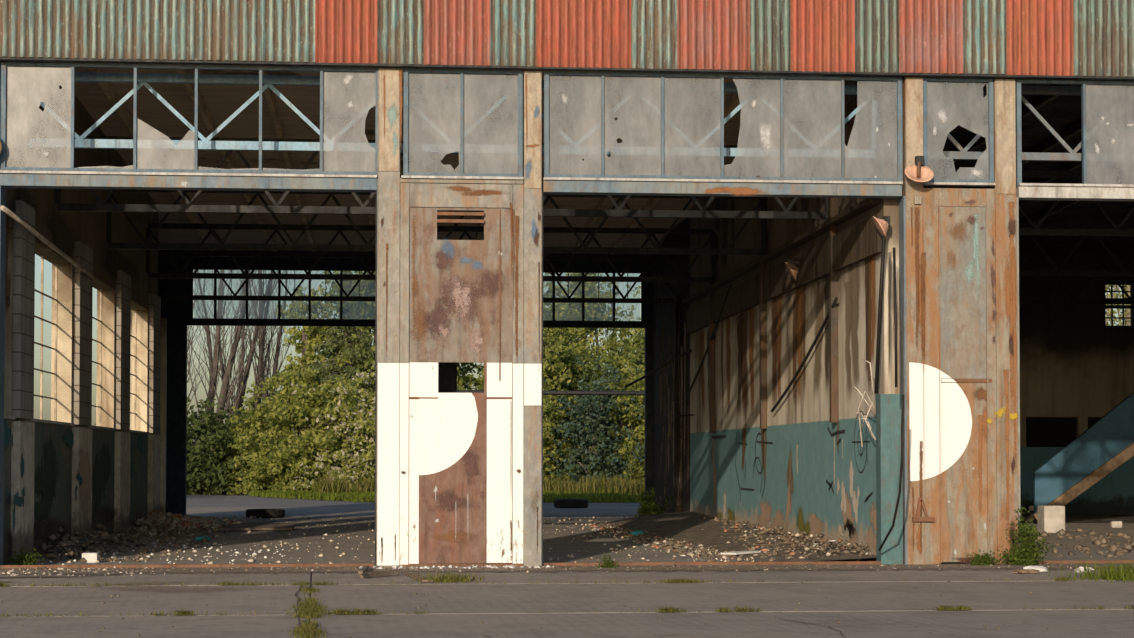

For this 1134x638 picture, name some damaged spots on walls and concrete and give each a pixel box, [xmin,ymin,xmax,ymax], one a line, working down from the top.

rust [950,200,983,239]
peeling [453,280,470,317]
damp [814,276,829,389]
damp [845,263,859,391]
rust [911,207,926,359]
rust [991,202,1017,550]
peeling [757,445,798,528]
peeling [834,437,876,551]
rust [912,441,923,553]
rust [975,388,987,511]